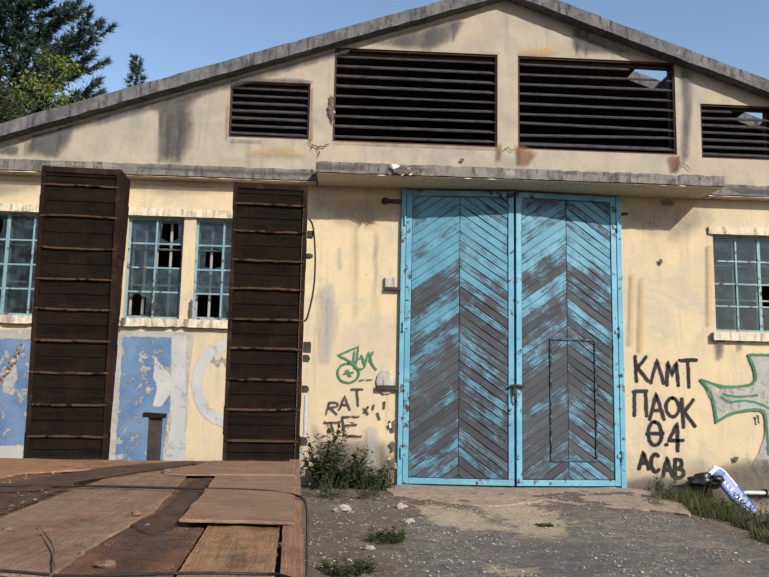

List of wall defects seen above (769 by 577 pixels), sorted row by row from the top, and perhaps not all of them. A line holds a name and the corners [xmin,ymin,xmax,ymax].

damp [574,29,628,53]
damp [28,49,347,157]
crack [309,141,329,179]